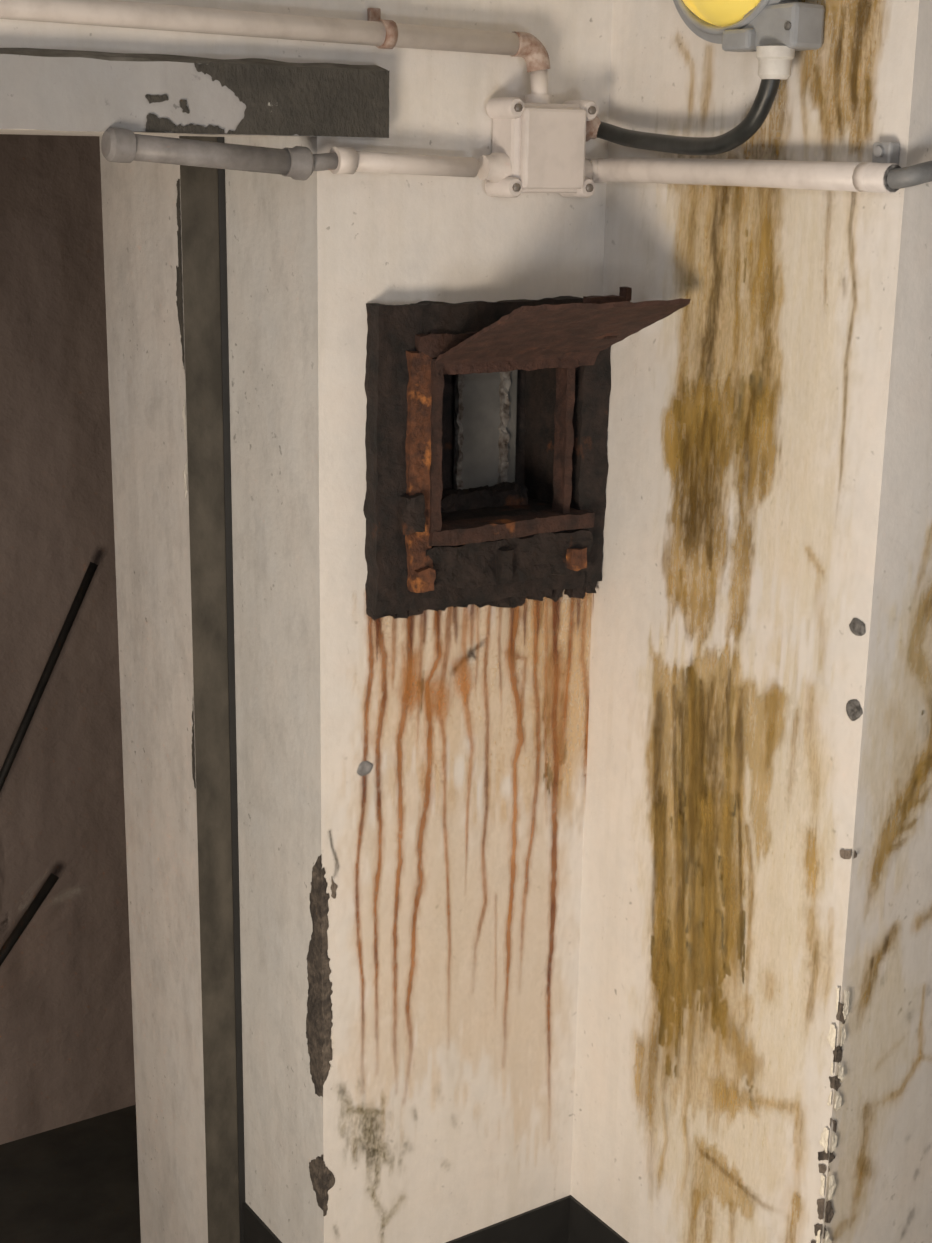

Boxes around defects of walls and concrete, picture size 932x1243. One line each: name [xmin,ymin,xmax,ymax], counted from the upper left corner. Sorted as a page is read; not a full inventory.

peeling [145,62,390,138]
leakage [744,80,786,159]
leakage [801,0,882,150]
leakage [635,185,785,1123]
leakage [908,587,932,688]
corrosion [356,604,490,1025]
corrosion [506,593,594,1065]
leakage [871,726,932,886]
spalling [306,855,337,1097]
leakage [862,926,896,1004]
spalling [309,1154,335,1216]
leakage [692,1142,759,1242]